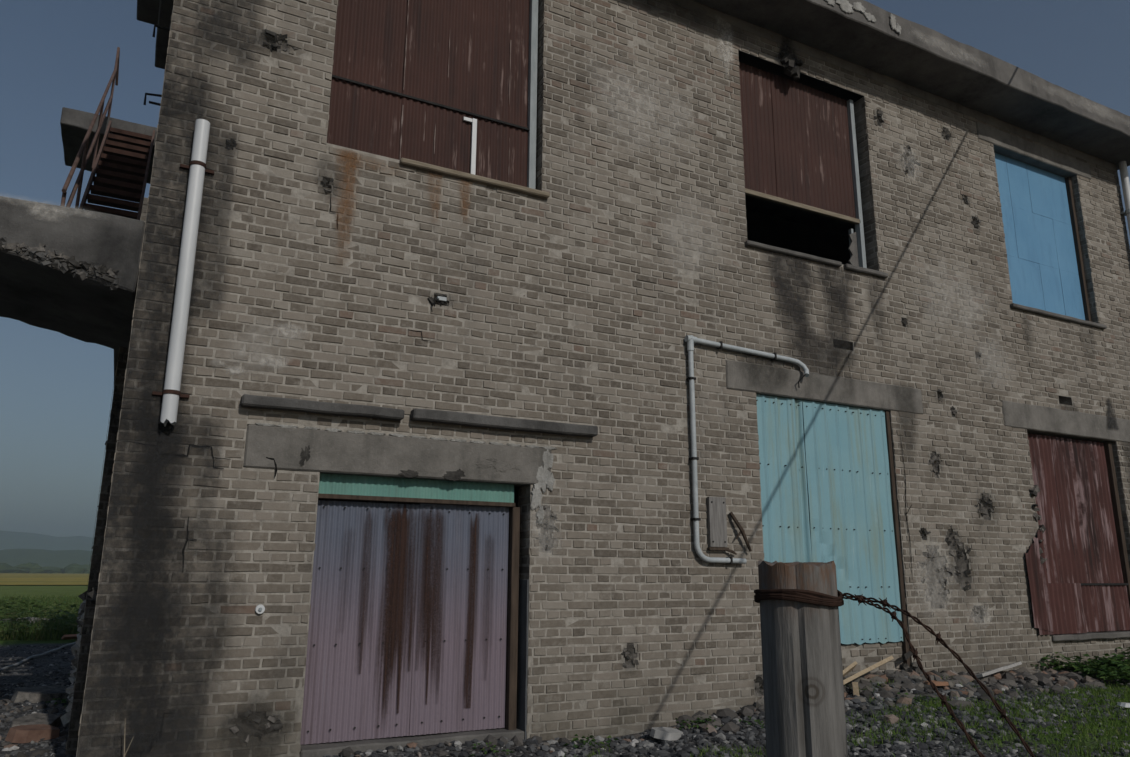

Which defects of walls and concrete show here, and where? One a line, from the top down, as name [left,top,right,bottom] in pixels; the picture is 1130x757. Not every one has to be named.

spalling [825,0,876,23]
spalling [890,13,901,34]
spalling [0,237,127,291]
water stain [771,255,851,373]
water stain [67,78,217,757]
peeling [255,423,557,552]
spalling [974,492,995,520]
spalling [919,526,972,609]
rust [377,504,443,725]
rust [464,515,479,708]
spalling [621,643,639,668]
spalling [227,710,283,743]